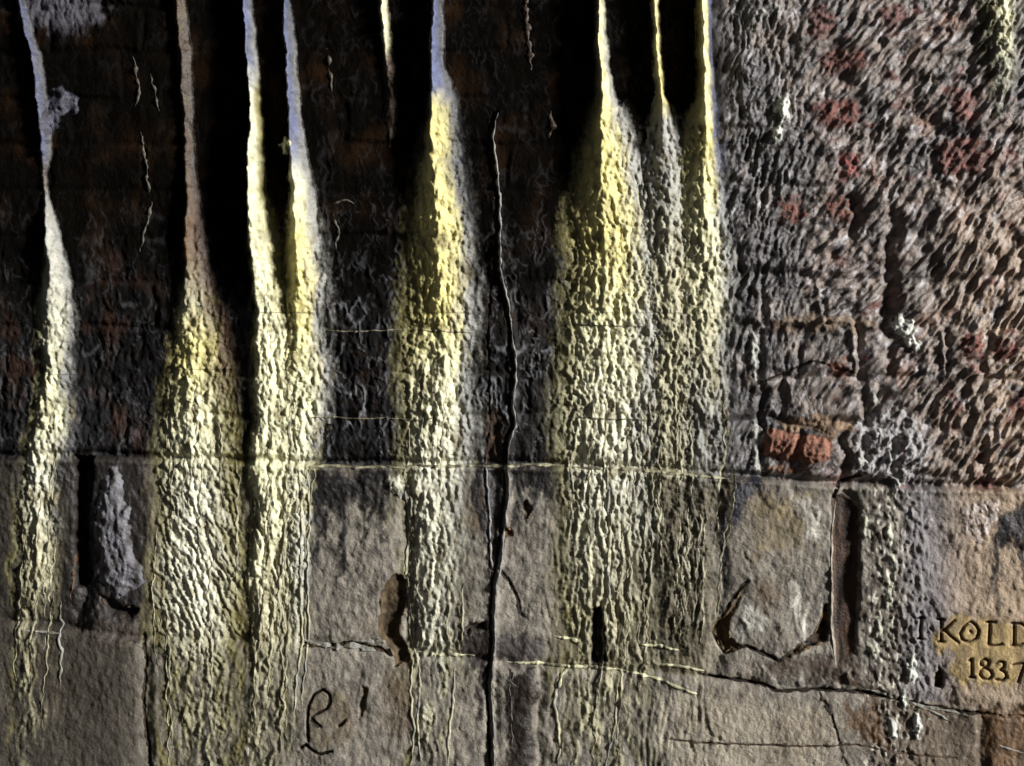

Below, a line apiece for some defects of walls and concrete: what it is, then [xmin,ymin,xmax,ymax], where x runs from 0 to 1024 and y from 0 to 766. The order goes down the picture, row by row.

damp [5,0,824,766]
crack [483,114,530,766]
spalling [378,573,411,666]
spalling [712,587,745,652]
spalling [792,604,829,654]
crack [670,581,1024,764]